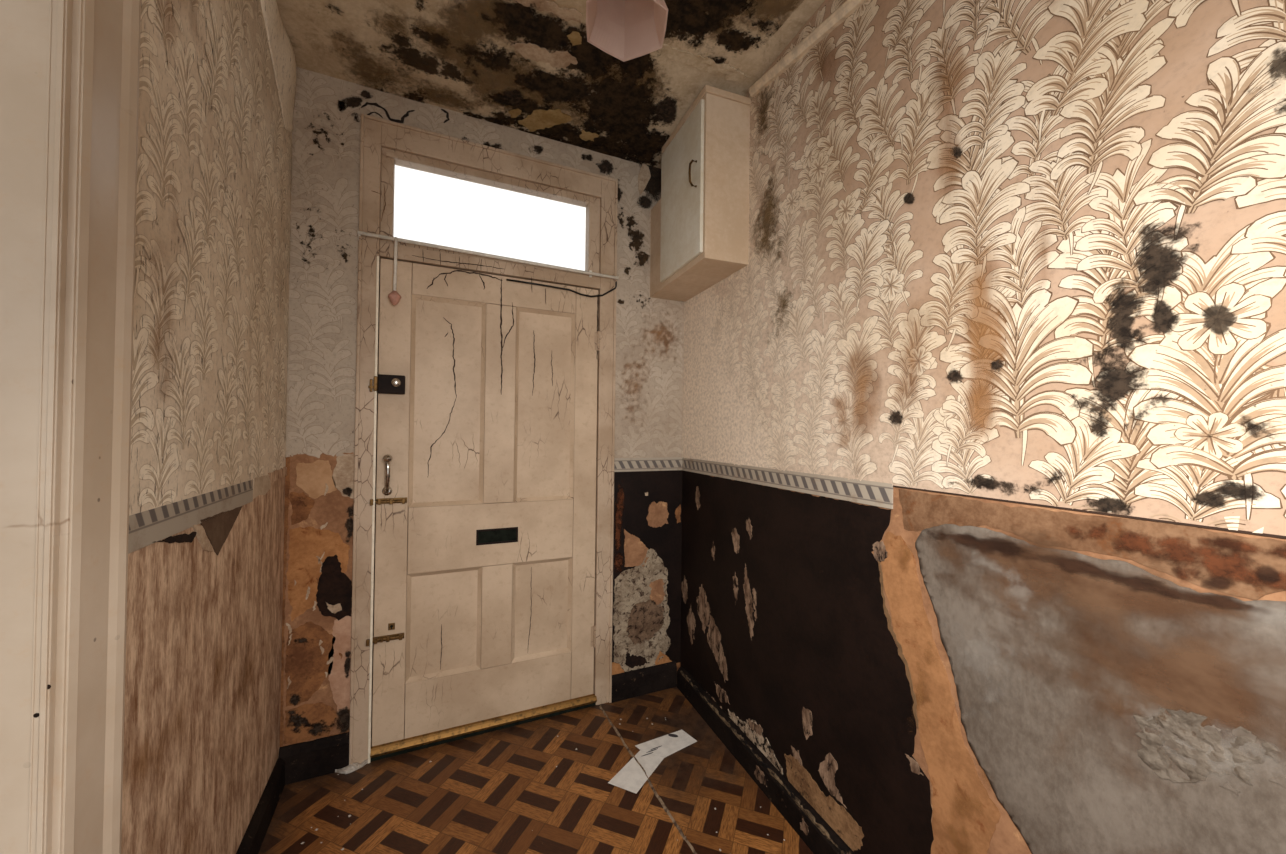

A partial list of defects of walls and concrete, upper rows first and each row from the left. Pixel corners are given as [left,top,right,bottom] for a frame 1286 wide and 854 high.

water stain [1269,49,1286,80]
water stain [309,0,800,280]
water stain [947,276,1003,426]
water stain [1072,223,1199,437]
water stain [1203,305,1237,334]
flaking render [645,486,700,528]
water stain [951,471,1062,495]
water stain [1087,497,1132,515]
water stain [1191,481,1262,507]
flaking render [283,452,355,746]
flaking render [612,519,864,852]
peeling [873,489,1286,854]